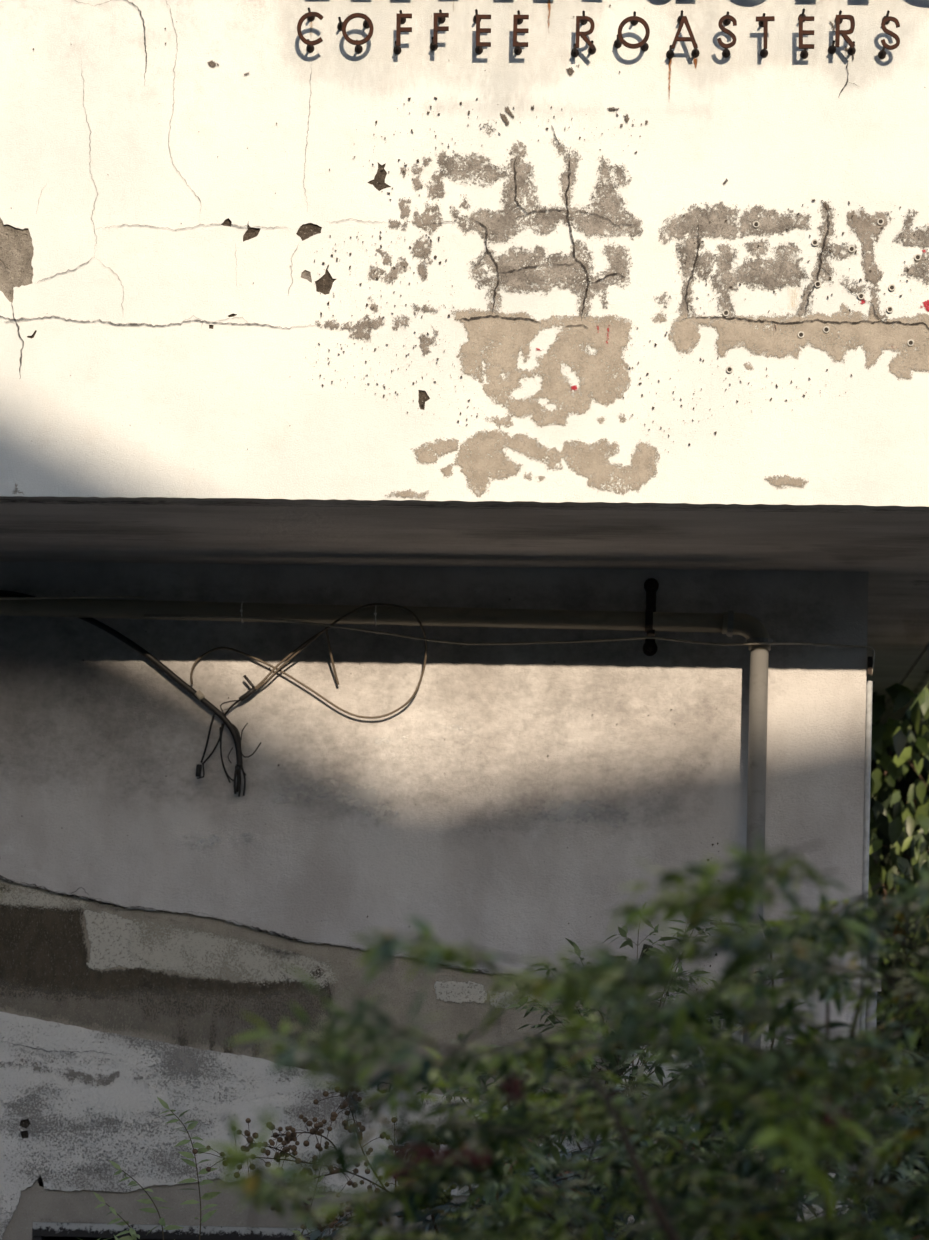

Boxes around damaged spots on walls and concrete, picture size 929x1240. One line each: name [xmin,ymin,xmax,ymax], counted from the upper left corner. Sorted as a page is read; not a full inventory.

crack [129,2,147,83]
peeling [484,107,514,134]
flaking render [0,218,34,302]
crack [37,258,92,283]
crack [0,302,314,378]
crack [105,198,277,230]
peeling [316,137,660,497]
crack [434,125,632,329]
peeling [652,199,929,380]
crack [673,207,929,339]
peeling [765,474,809,489]
flaking render [0,878,627,1104]